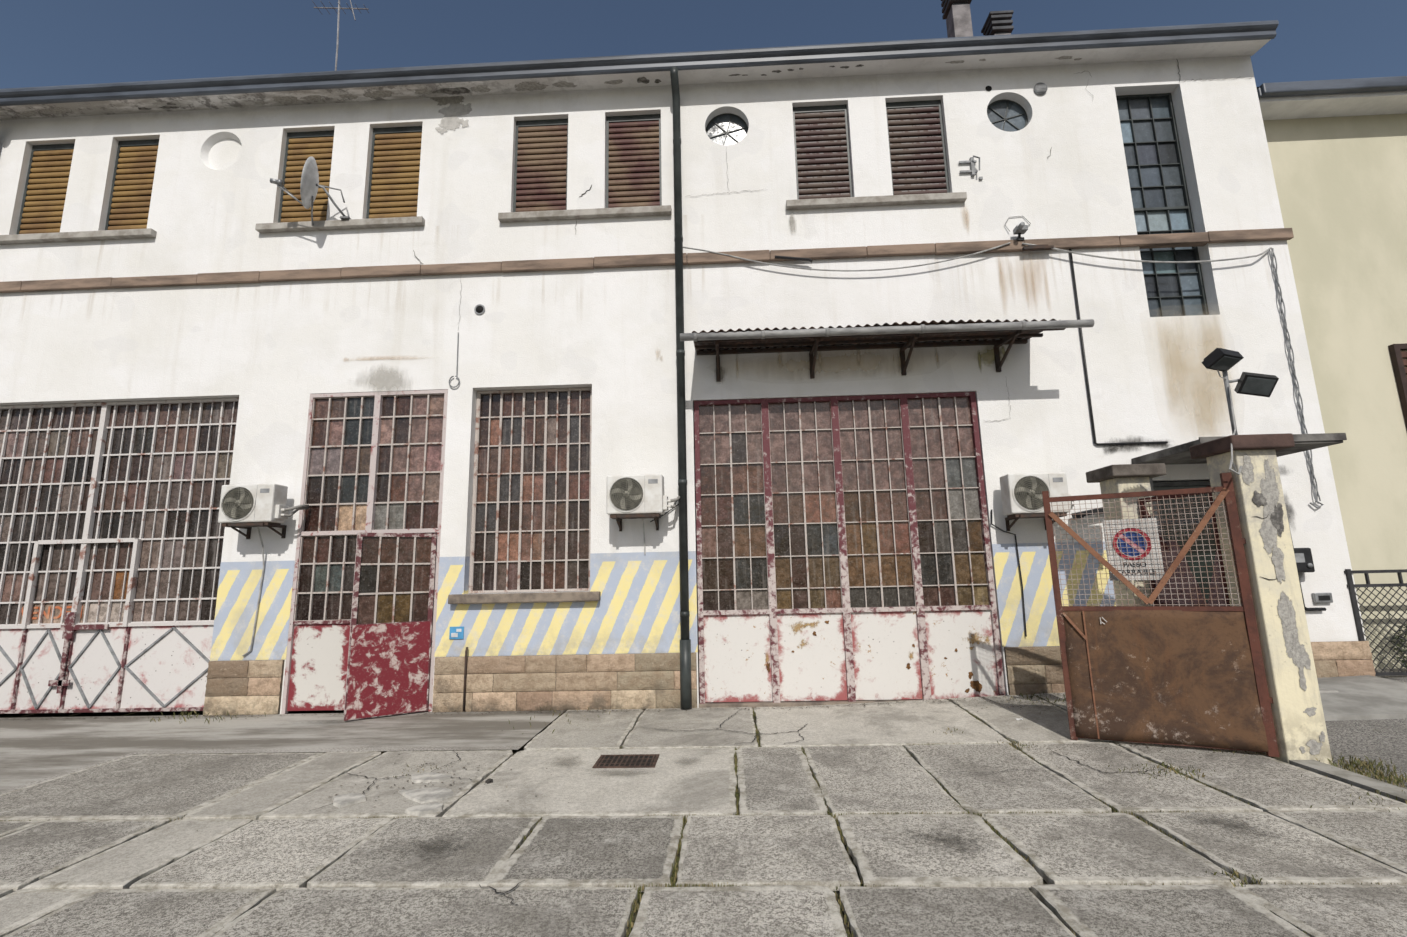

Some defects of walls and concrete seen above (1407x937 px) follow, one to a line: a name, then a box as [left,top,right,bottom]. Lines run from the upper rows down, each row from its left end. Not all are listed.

flaking render [415,85,491,134]
peeling [1241,454,1311,691]
peeling [1300,731,1325,755]